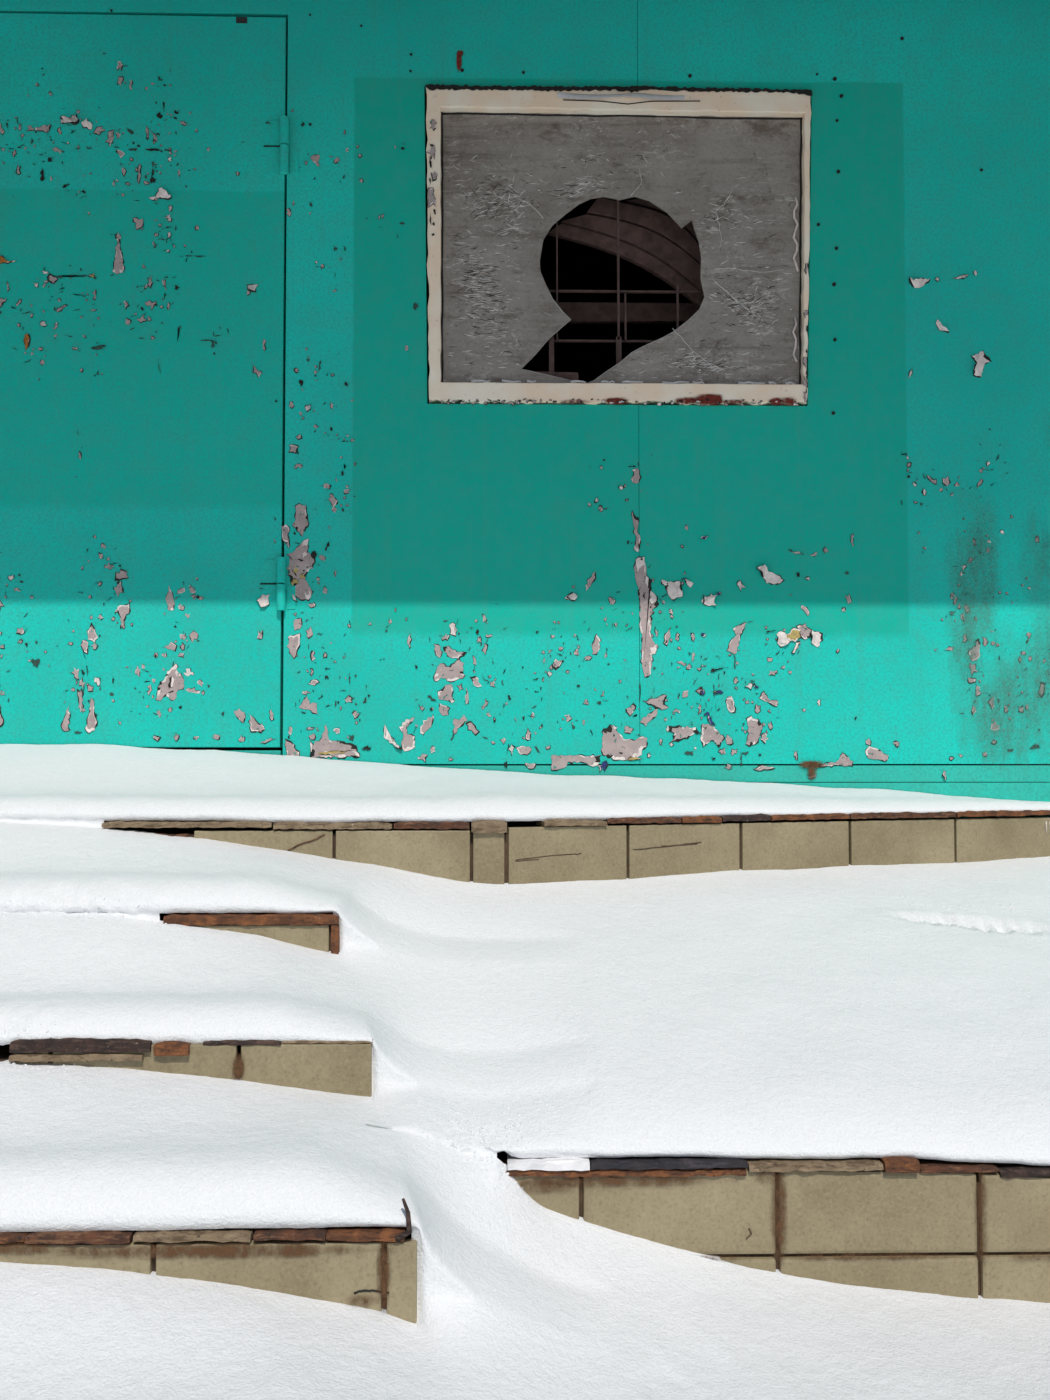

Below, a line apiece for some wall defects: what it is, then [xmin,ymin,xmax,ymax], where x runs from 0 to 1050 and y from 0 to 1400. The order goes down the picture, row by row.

peeling [0,53,205,380]
peeling [909,270,978,288]
peeling [971,351,992,378]
rust [676,394,742,406]
peeling [221,348,840,771]
peeling [0,535,210,734]
peeling [934,515,1050,757]
peeling [153,734,220,742]
peeling [808,739,900,780]